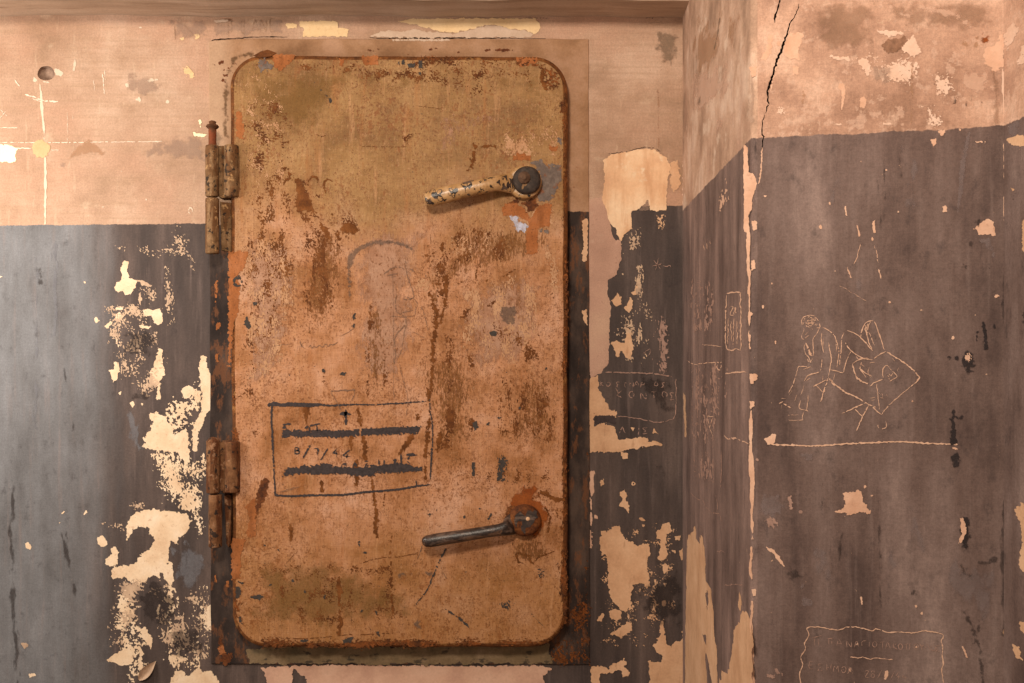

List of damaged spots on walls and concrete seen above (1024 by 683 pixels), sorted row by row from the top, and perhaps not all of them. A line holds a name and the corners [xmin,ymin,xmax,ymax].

peeling [285,20,349,37]
peeling [371,17,540,42]
crack [758,0,799,184]
peeling [829,30,921,86]
peeling [921,23,1024,147]
corrosion [214,99,360,441]
corrosion [254,48,591,666]
peeling [94,225,272,683]
corrosion [231,478,269,580]
peeling [589,471,783,683]
peeling [835,485,873,517]